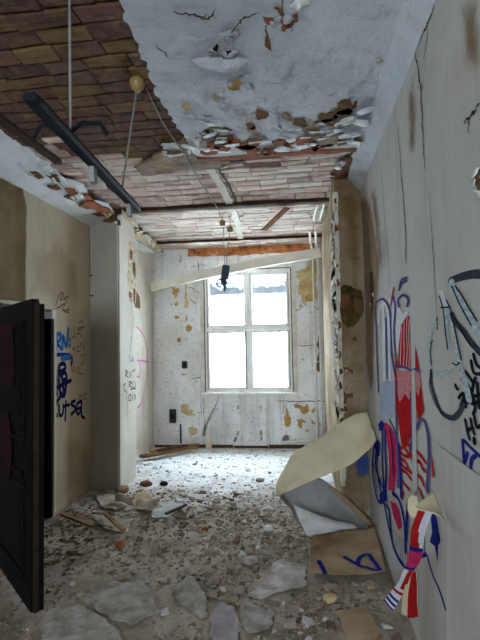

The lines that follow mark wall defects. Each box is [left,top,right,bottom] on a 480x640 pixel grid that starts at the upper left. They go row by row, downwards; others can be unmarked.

crack [172,9,216,20]
crack [232,12,258,33]
flaking render [132,98,375,179]
crack [415,5,434,168]
crack [464,103,480,134]
crack [397,125,407,260]
flaking render [23,165,163,309]
flaking render [293,259,318,310]
peeling [329,192,355,426]
leakage [340,197,381,386]
flaking render [284,402,321,433]